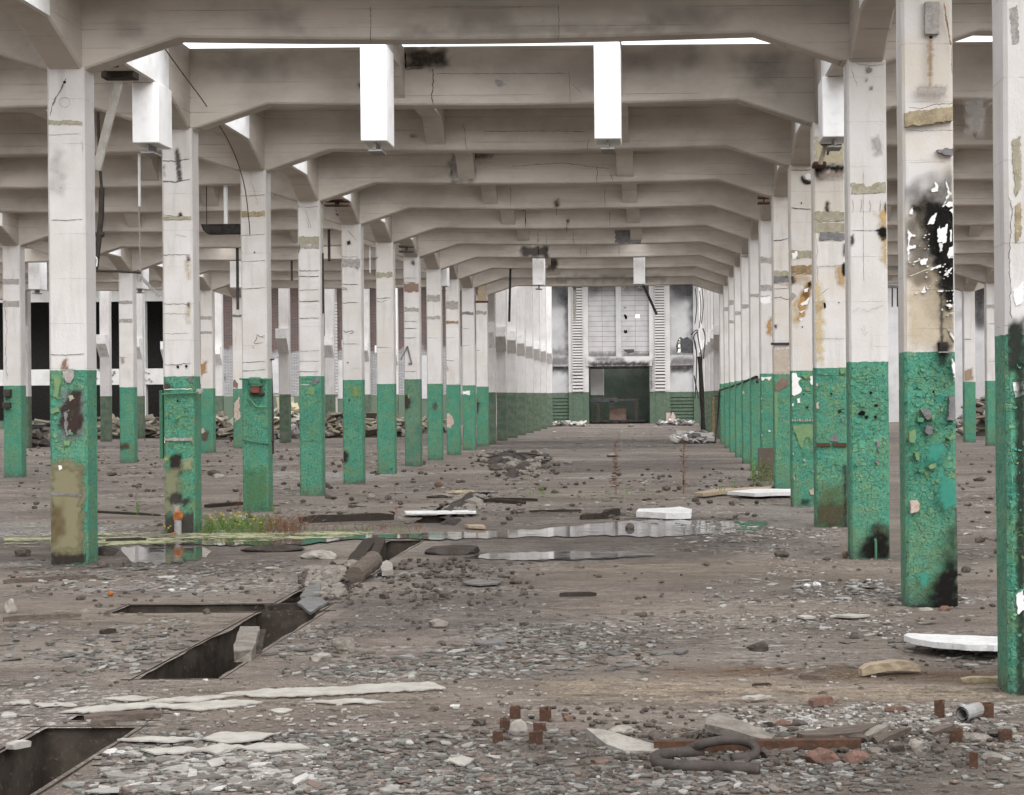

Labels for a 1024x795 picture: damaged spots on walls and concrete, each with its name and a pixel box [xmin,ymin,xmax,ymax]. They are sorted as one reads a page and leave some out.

damp [407,50,447,68]
peeling [1012,136,1022,242]
damp [521,245,557,271]
rust [794,275,824,352]
peeling [907,182,954,316]
peeling [1013,282,1024,306]
peeling [50,369,100,446]
peeling [164,404,205,453]
peeling [761,368,888,495]
peeling [907,358,956,522]